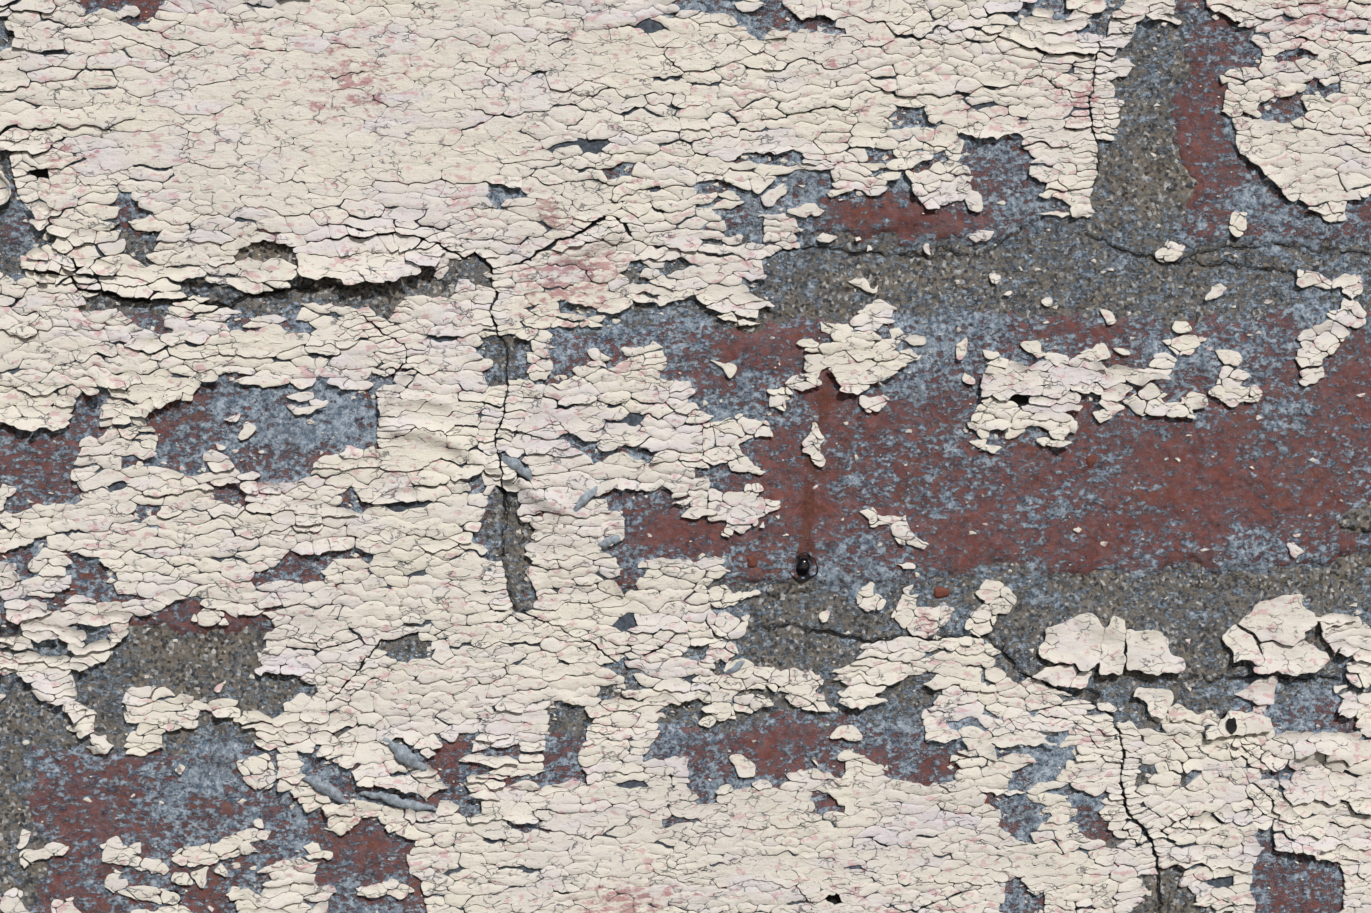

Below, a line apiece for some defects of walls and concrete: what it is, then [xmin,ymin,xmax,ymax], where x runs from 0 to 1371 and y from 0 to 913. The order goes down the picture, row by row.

peeling [0,5,30,61]
peeling [72,0,229,37]
peeling [0,140,503,346]
crack [769,216,1044,260]
crack [1086,234,1371,275]
crack [322,215,673,694]
rust [799,380,830,565]
peeling [455,0,1371,854]
peeling [0,358,650,913]
crack [751,623,1188,913]
peeling [1112,819,1357,913]